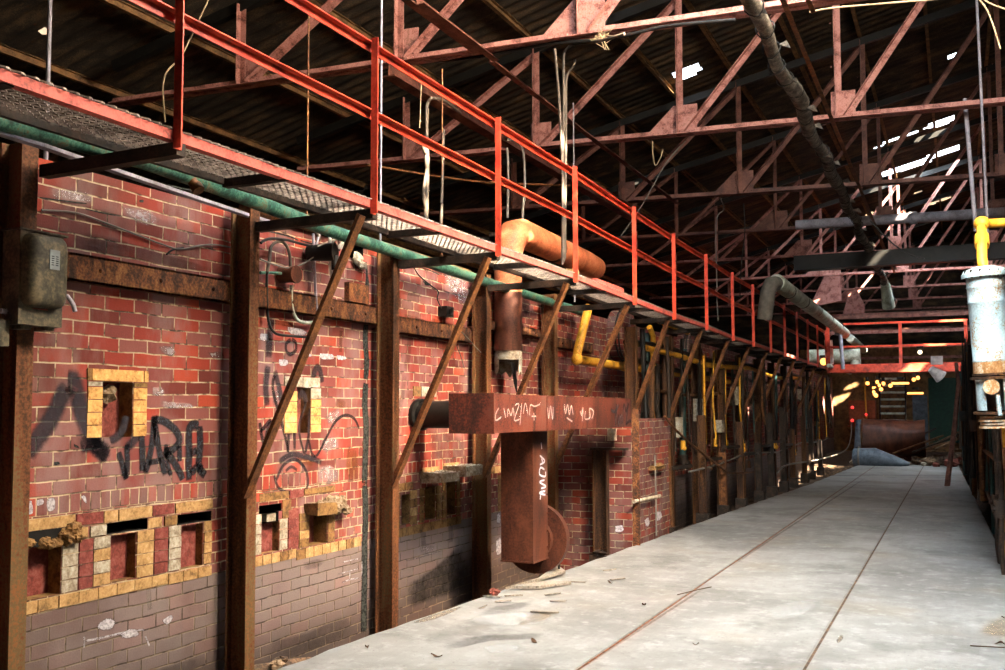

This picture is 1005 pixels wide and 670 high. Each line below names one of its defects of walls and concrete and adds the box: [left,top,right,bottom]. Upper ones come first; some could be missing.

corrosion [973,360,1005,374]